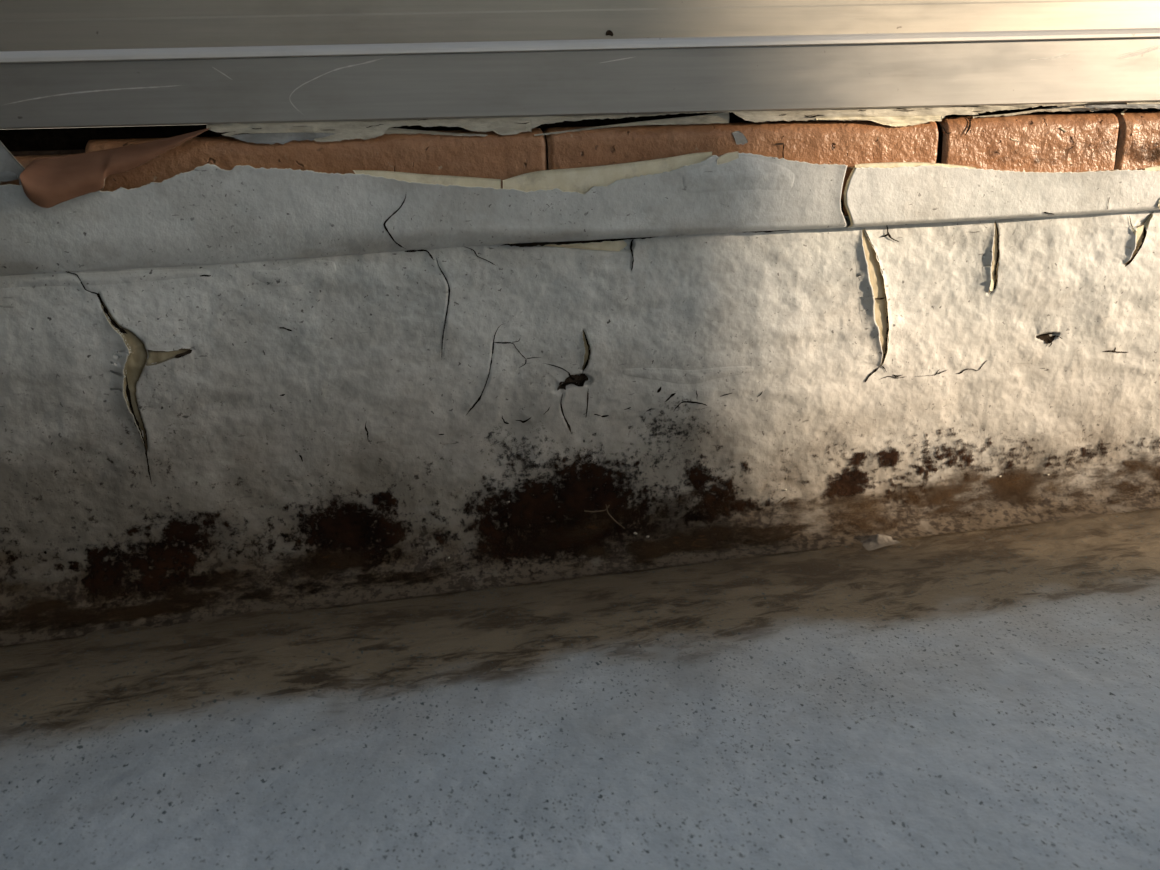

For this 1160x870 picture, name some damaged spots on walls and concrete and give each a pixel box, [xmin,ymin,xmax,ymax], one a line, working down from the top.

peeling [0,128,210,208]
crack [383,196,450,347]
peeling [353,151,739,194]
crack [841,182,849,224]
peeling [982,221,1000,294]
peeling [1123,199,1160,268]
crack [66,271,192,484]
crack [466,325,550,424]
crack [879,361,986,380]
water stain [0,396,810,631]
water stain [814,424,1160,534]